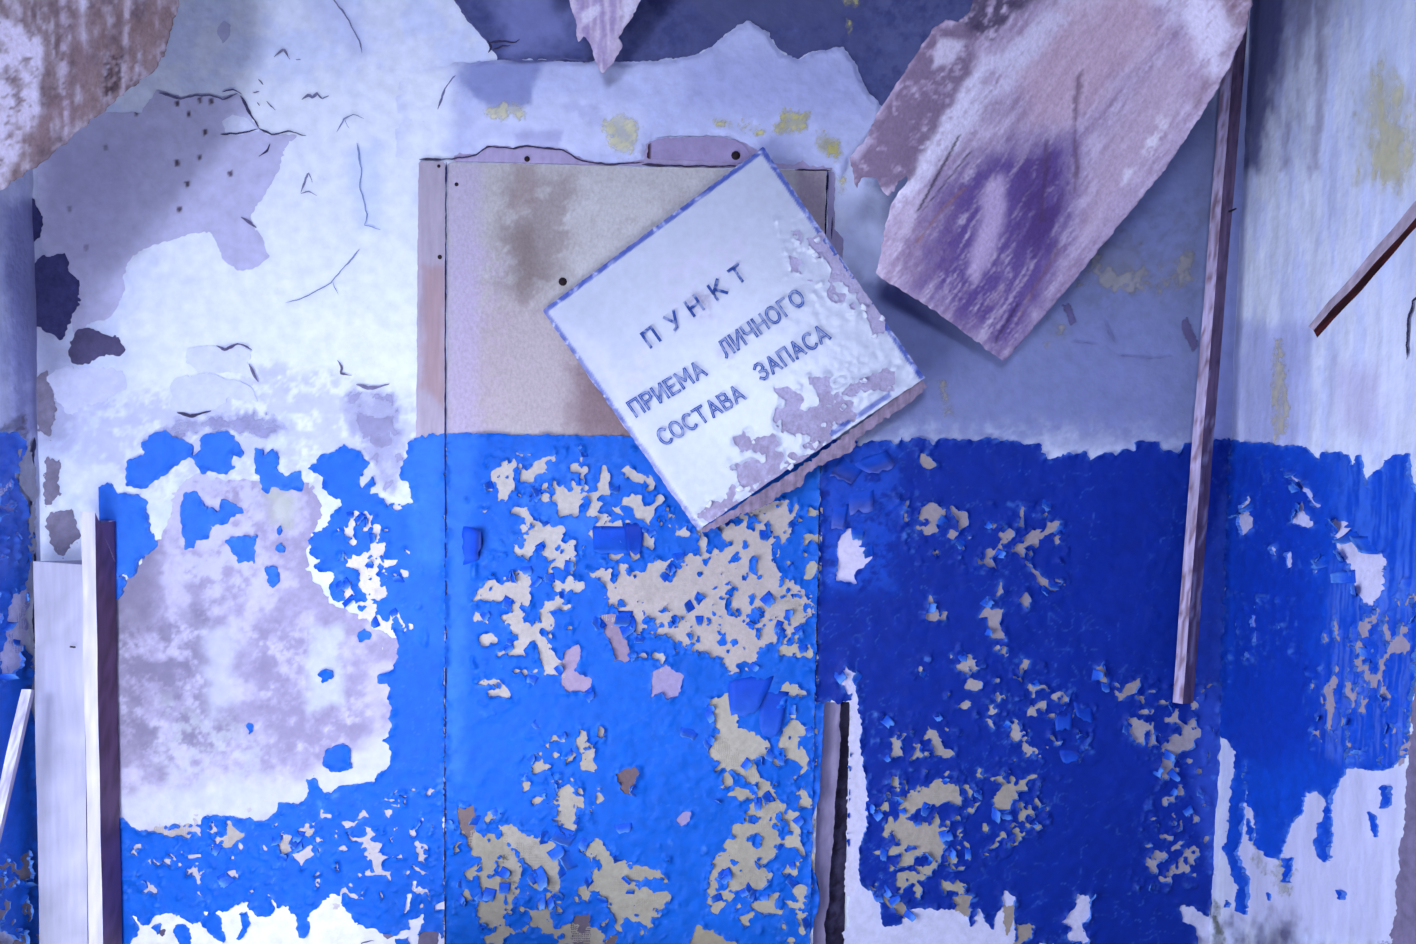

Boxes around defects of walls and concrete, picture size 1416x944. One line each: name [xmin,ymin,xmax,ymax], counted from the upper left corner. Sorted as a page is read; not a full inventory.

spalling [647,136,750,163]
spalling [0,370,81,559]
peeling [920,453,936,469]
peeling [473,443,874,702]
peeling [0,589,35,682]
flaking render [116,473,671,944]
flaking render [689,499,1075,944]
peeling [1091,661,1212,893]
peeling [0,852,39,944]
peeling [1062,893,1098,944]
flaking render [1179,905,1210,944]
leakage [1243,927,1291,944]